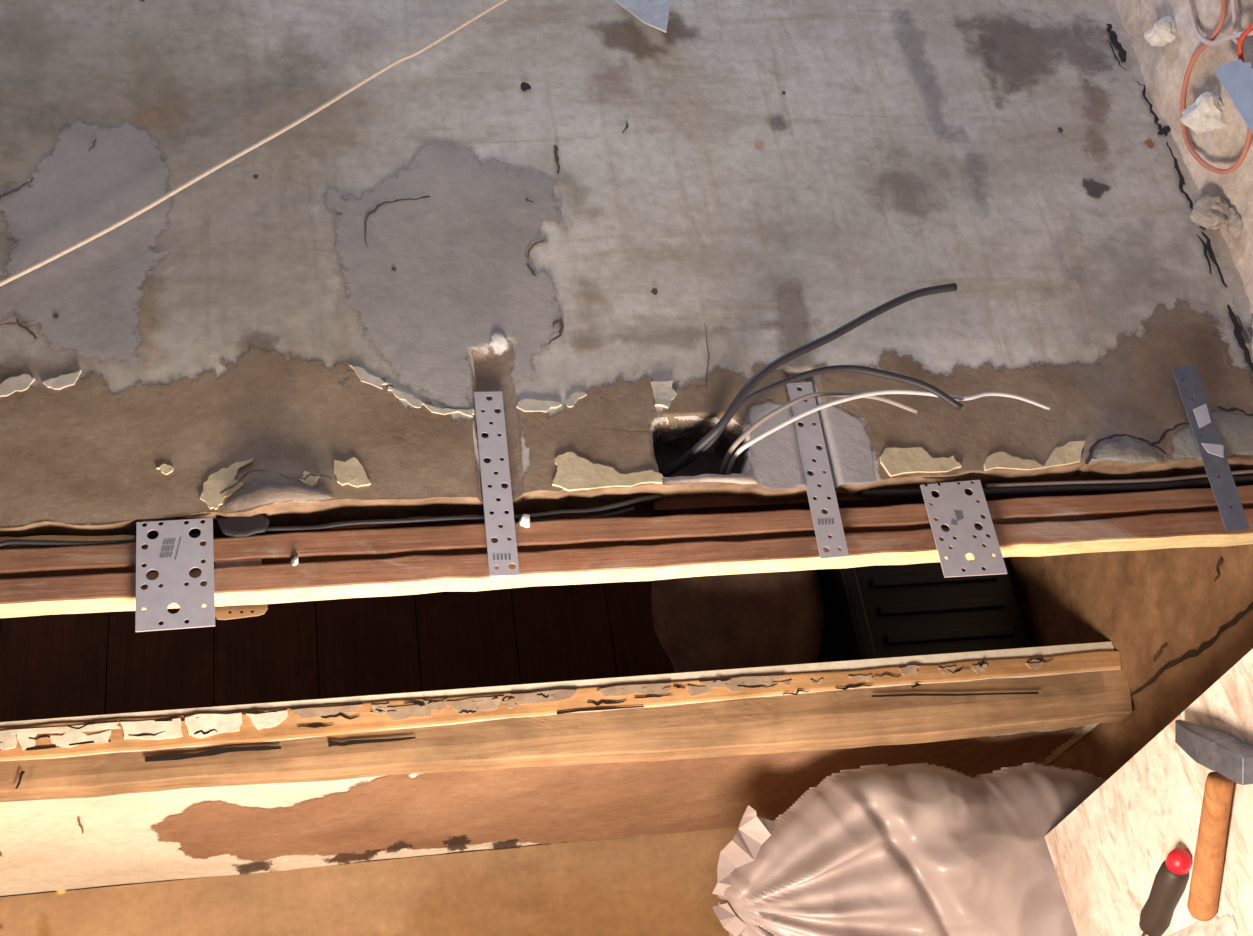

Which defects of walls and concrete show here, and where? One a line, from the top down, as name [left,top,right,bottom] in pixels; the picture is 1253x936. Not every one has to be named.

leakage [592,15,695,58]
leakage [972,21,1108,90]
spalling [1083,178,1111,198]
crack [1106,24,1253,371]
peeling [0,120,564,528]
peeling [517,299,1253,493]
crack [1214,557,1223,582]
peeling [0,689,577,750]
peeling [597,683,671,697]
peeling [687,675,791,696]
peeling [848,675,873,683]
crack [1131,602,1253,696]